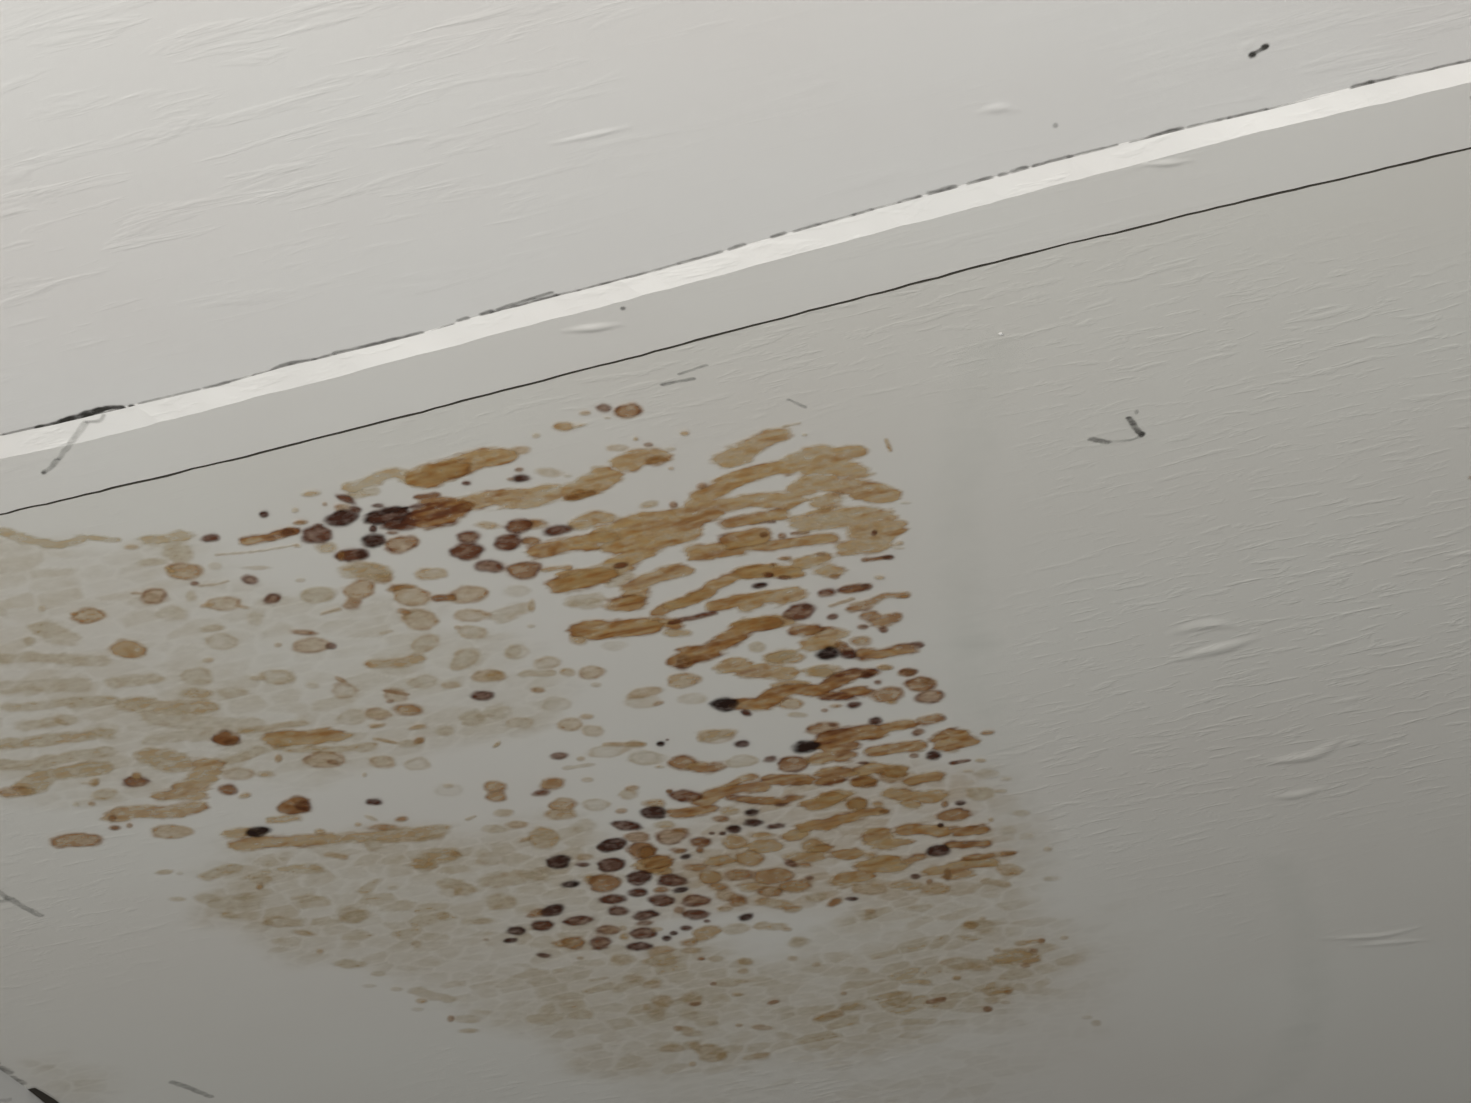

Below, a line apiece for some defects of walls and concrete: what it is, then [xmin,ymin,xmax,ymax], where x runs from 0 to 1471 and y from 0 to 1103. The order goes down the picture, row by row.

water stain [585,404,642,417]
water stain [1,531,104,547]
water stain [143,532,218,543]
water stain [142,564,201,603]
water stain [71,609,104,623]
water stain [111,641,146,658]
water stain [222,429,1016,960]
water stain [0,728,352,848]